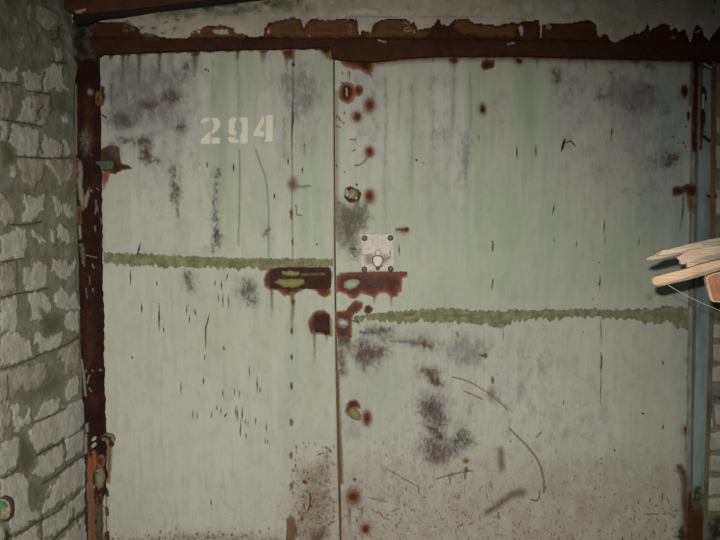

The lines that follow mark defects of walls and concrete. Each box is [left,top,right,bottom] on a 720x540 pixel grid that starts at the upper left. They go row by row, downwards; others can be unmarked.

spalling [93,22,139,39]
spalling [188,25,246,39]
spalling [262,18,431,43]
spalling [452,19,523,45]
spalling [542,22,603,41]
spalling [635,26,686,44]
corrosion [337,82,374,127]
corrosion [101,143,131,184]
corrosion [344,184,374,203]
corrosion [672,184,697,213]
corrosion [264,265,407,540]
corrosion [86,441,119,540]